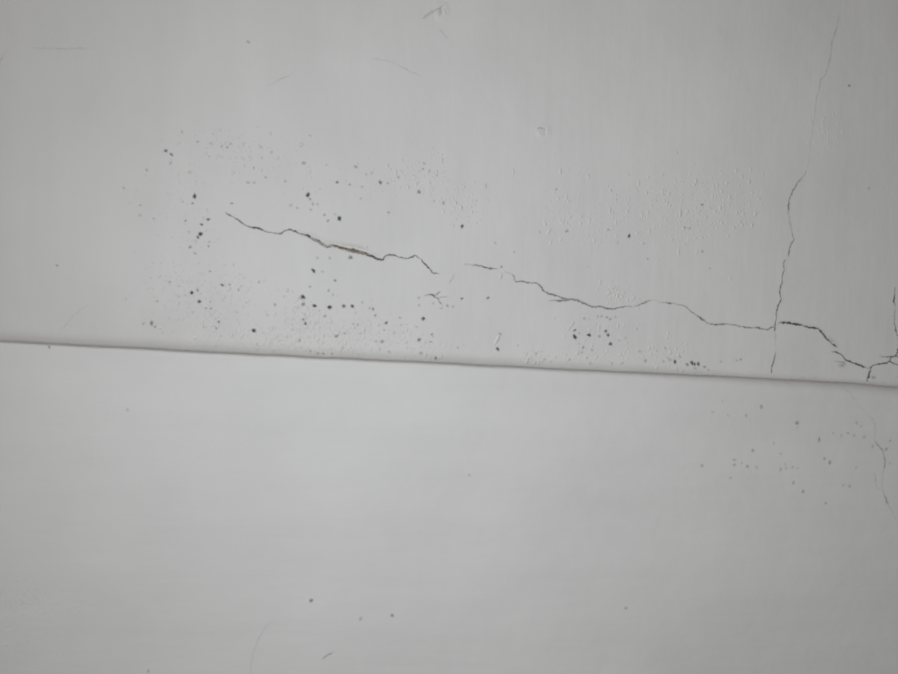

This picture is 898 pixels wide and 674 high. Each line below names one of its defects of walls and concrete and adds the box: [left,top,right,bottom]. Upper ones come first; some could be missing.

leakage [288,192,342,222]
leakage [184,218,211,255]
crack [225,0,898,521]
leakage [300,279,402,353]
leakage [568,314,627,365]